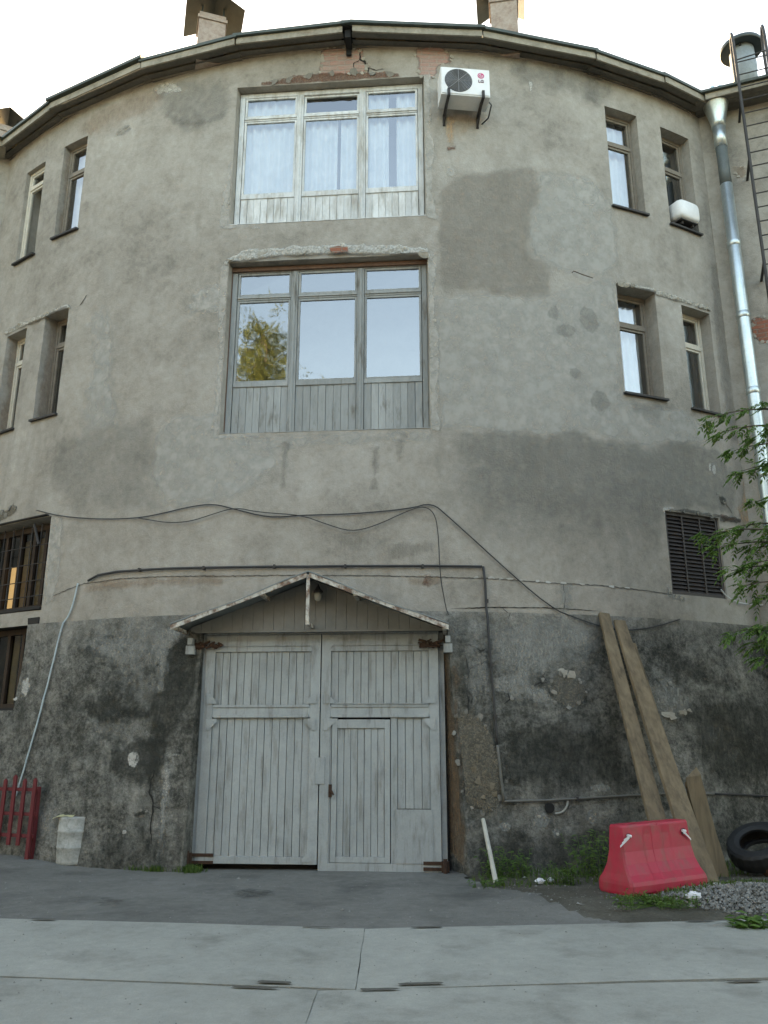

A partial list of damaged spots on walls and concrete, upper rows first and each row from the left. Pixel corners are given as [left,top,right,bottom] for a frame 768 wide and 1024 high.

flaking render [317,45,370,77]
flaking render [751,314,768,344]
flaking render [494,668,587,710]
leakage [84,625,203,868]
crack [148,773,160,843]